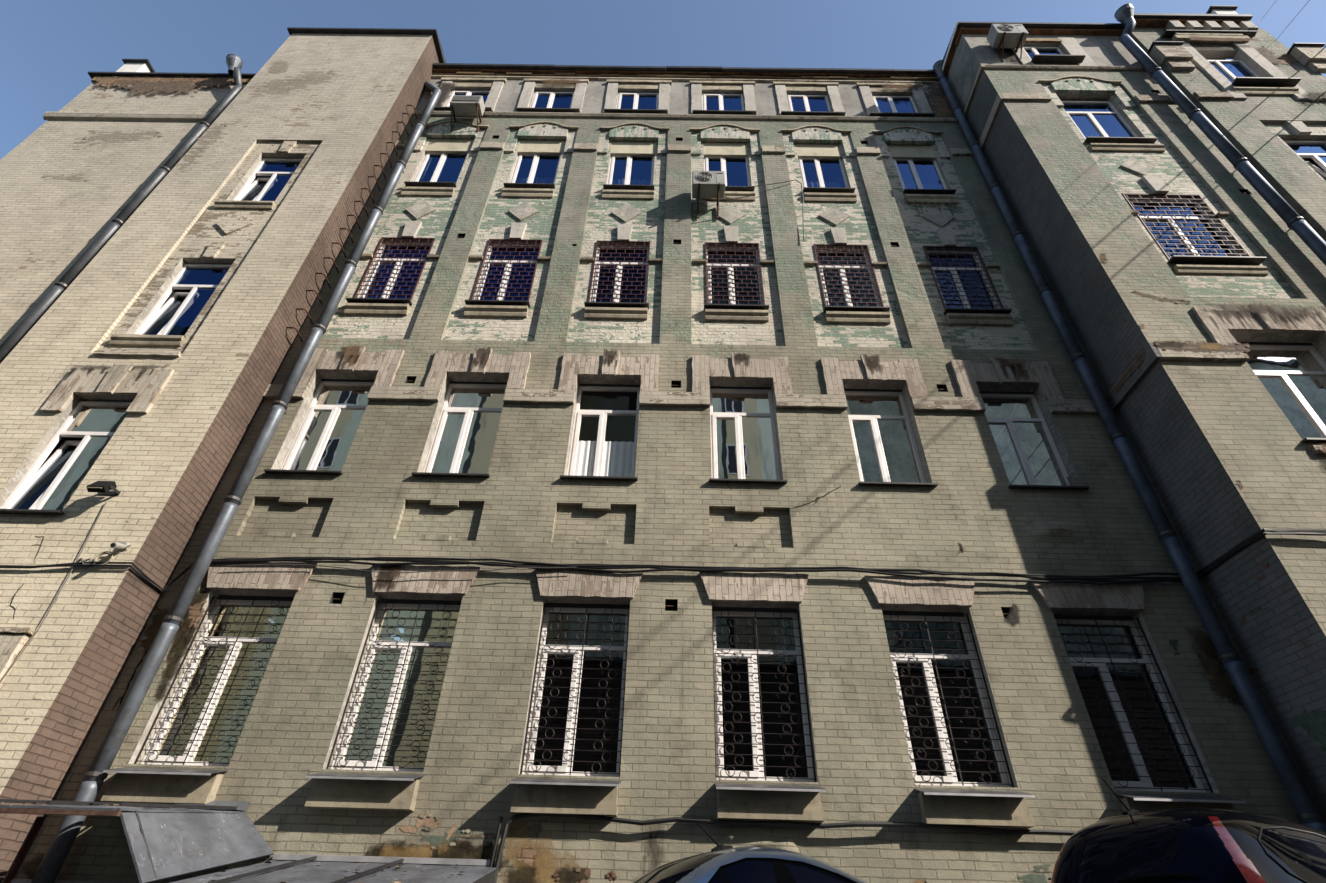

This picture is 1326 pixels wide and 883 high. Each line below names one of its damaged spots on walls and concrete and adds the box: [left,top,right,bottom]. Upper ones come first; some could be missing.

flaking render [95,76,234,96]
crack [790,486,841,509]
leakage [1190,631,1243,705]
leakage [506,825,576,883]